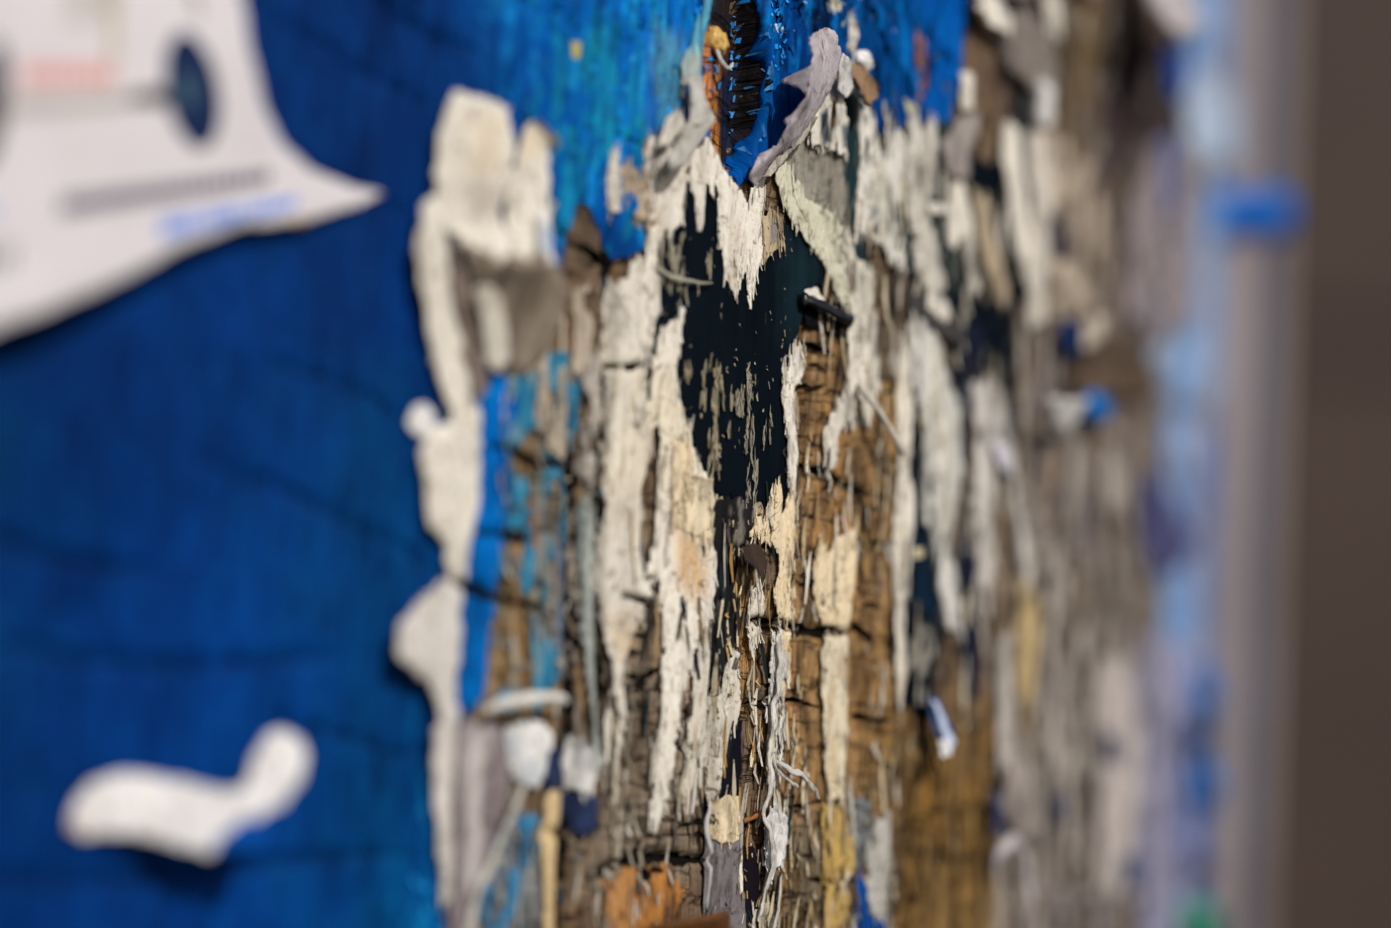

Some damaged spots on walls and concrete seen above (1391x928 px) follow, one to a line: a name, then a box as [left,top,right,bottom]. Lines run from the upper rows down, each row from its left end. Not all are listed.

peeling [659,0,808,155]
peeling [555,60,628,223]
spalling [803,296,849,341]
peeling [870,259,907,381]
peeling [1061,317,1081,358]
peeling [477,280,604,720]
peeling [1140,469,1193,575]
peeling [479,814,539,928]
peeling [701,785,750,928]
peeling [764,799,790,884]
peeling [820,796,886,928]
peeling [993,757,1069,847]